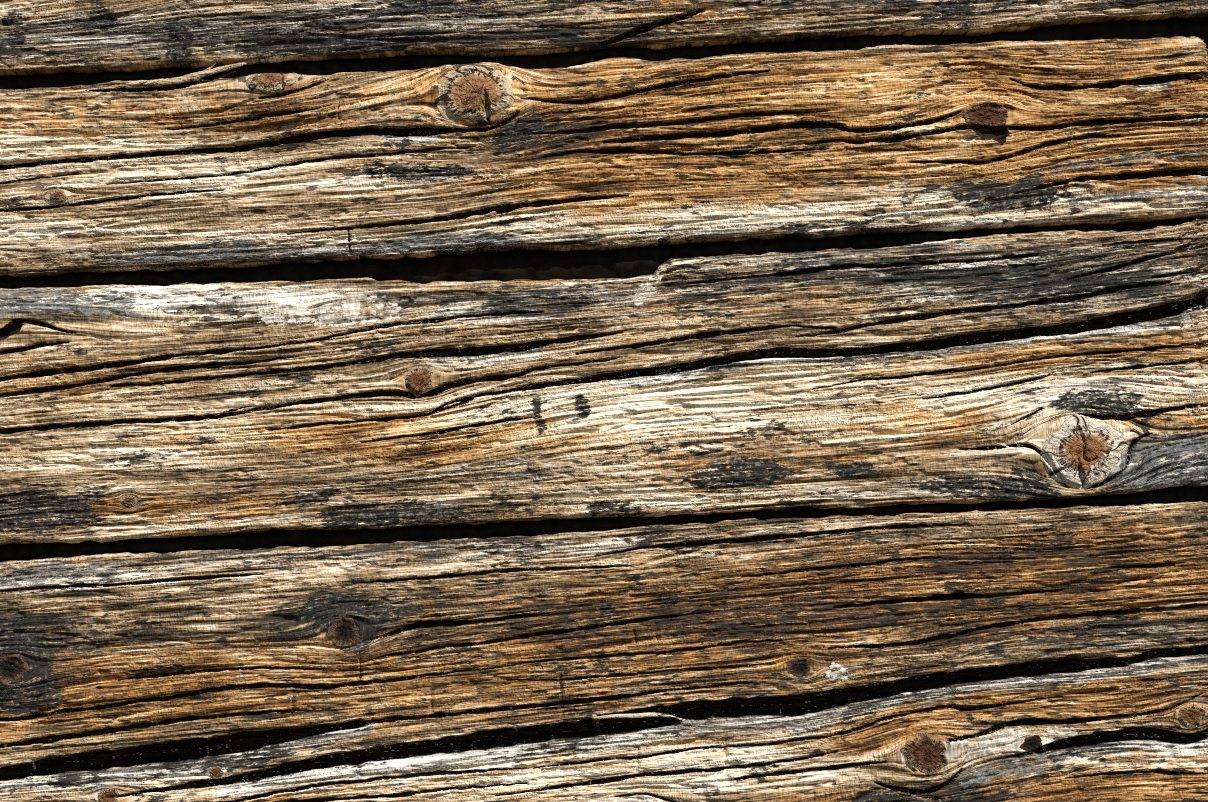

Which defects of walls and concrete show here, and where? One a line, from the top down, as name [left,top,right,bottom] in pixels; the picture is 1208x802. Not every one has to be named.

crack [0,237,1208,454]
crack [1063,404,1208,489]
crack [0,573,264,592]
crack [353,523,968,584]
crack [1110,562,1175,570]
crack [828,589,1208,650]
crack [0,611,1208,802]